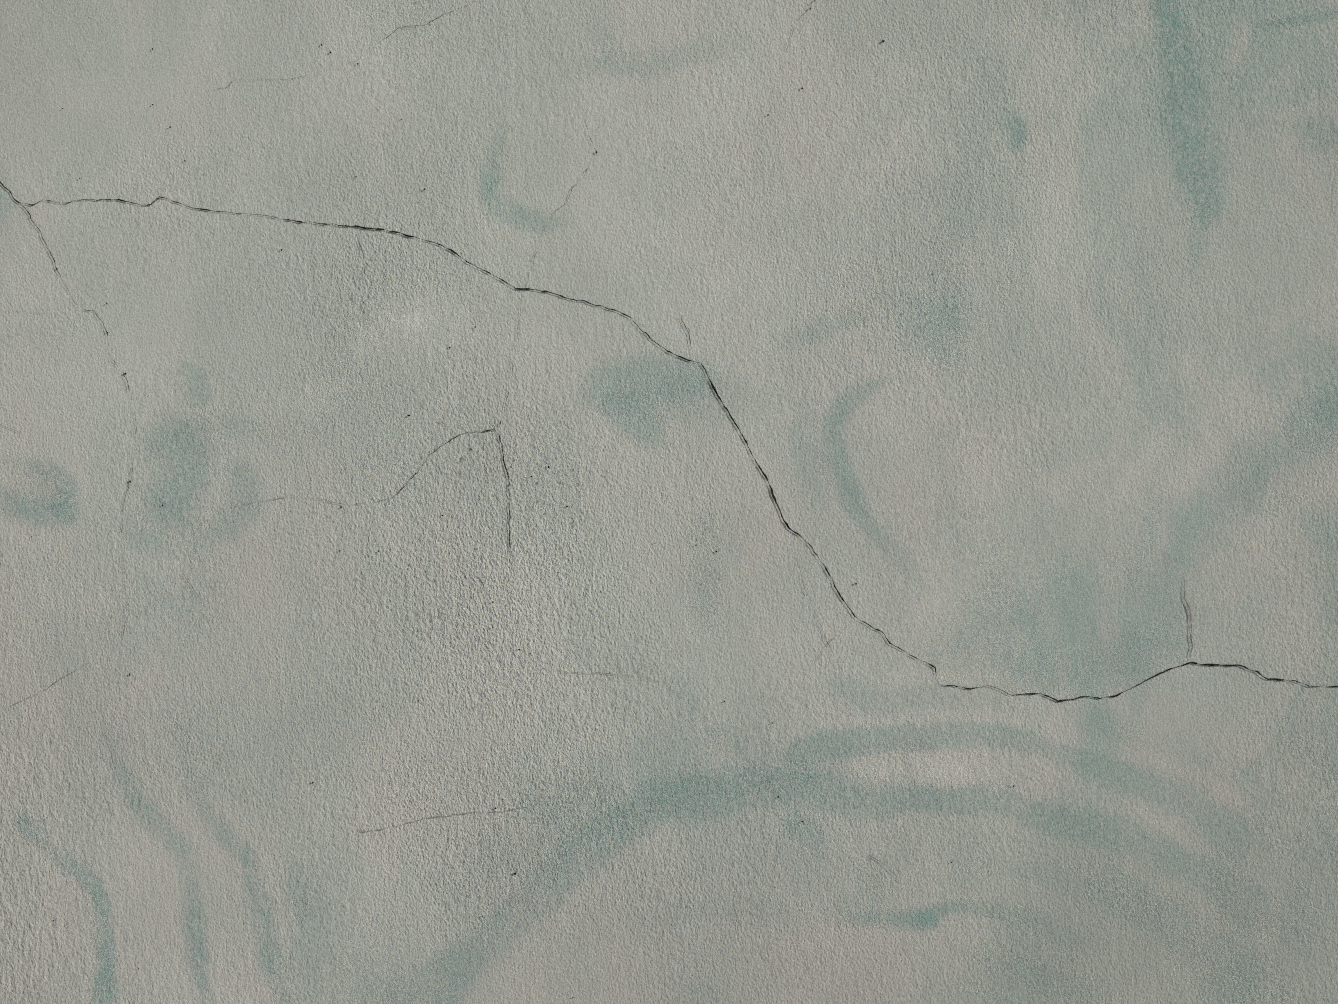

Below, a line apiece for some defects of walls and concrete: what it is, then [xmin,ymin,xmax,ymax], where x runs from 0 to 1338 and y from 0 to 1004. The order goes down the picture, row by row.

crack [0,118,1338,702]